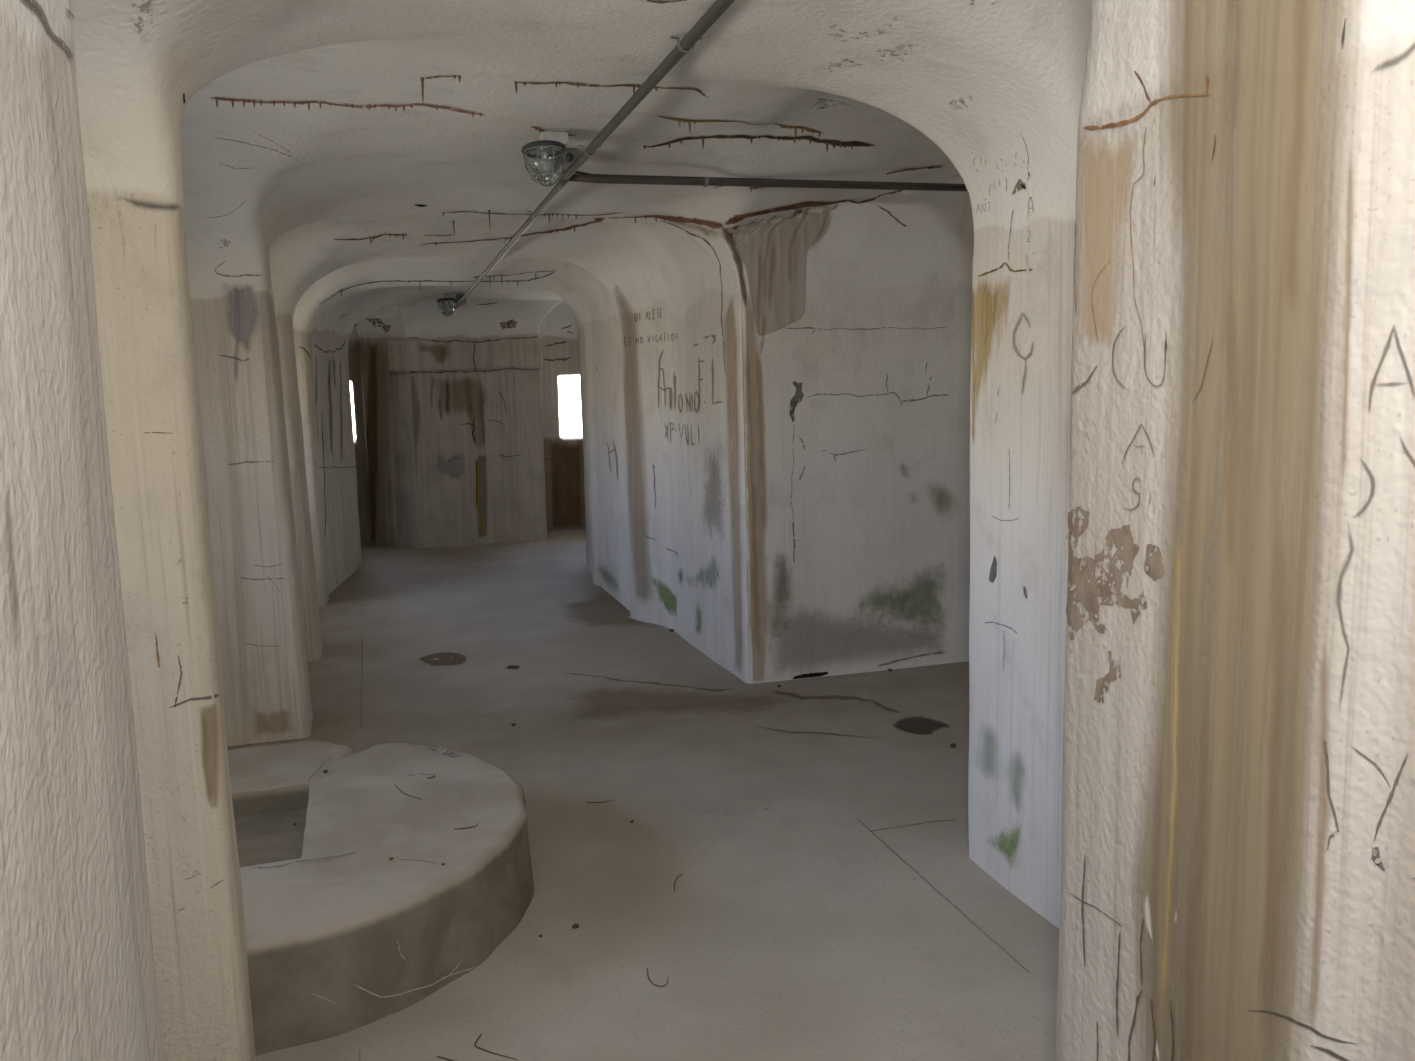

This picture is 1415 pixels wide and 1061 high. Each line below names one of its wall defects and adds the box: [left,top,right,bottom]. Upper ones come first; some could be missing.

crack [24,0,74,60]
peeling [132,0,150,41]
crack [320,81,946,374]
leakage [229,287,254,376]
crack [409,325,572,457]
crack [808,364,947,407]
crack [992,389,1019,521]
peeling [1066,507,1164,640]
crack [985,622,1017,669]
peeling [1094,651,1121,703]
crack [1324,741,1407,850]
crack [1249,1010,1356,1061]